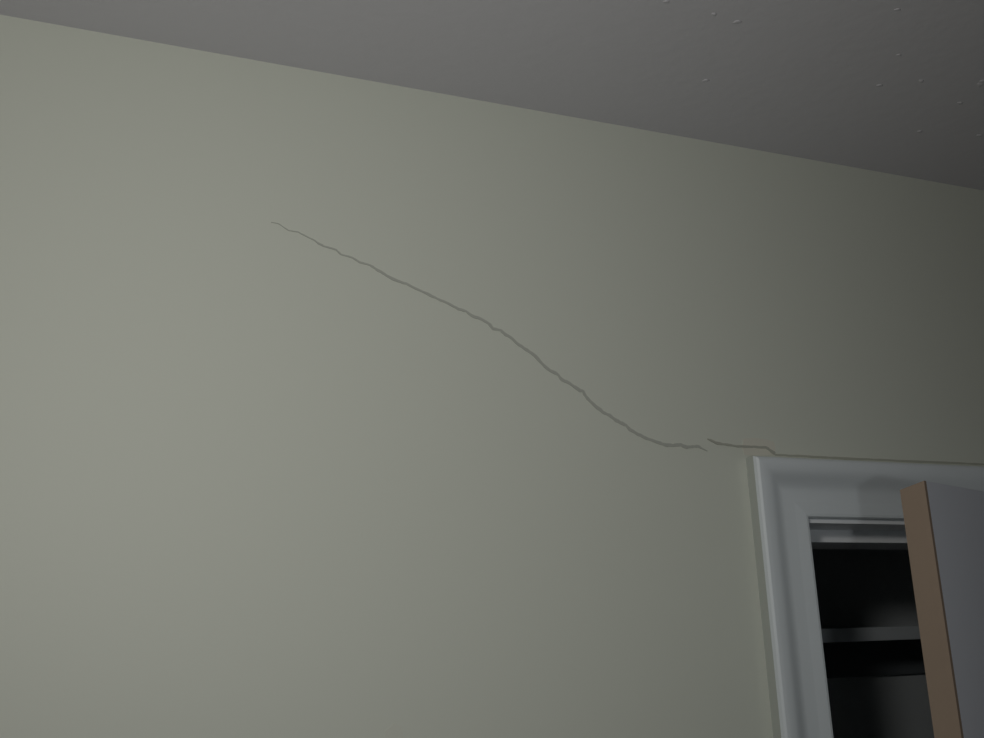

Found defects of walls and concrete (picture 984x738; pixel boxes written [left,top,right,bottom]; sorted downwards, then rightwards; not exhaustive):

crack [271,222,984,465]